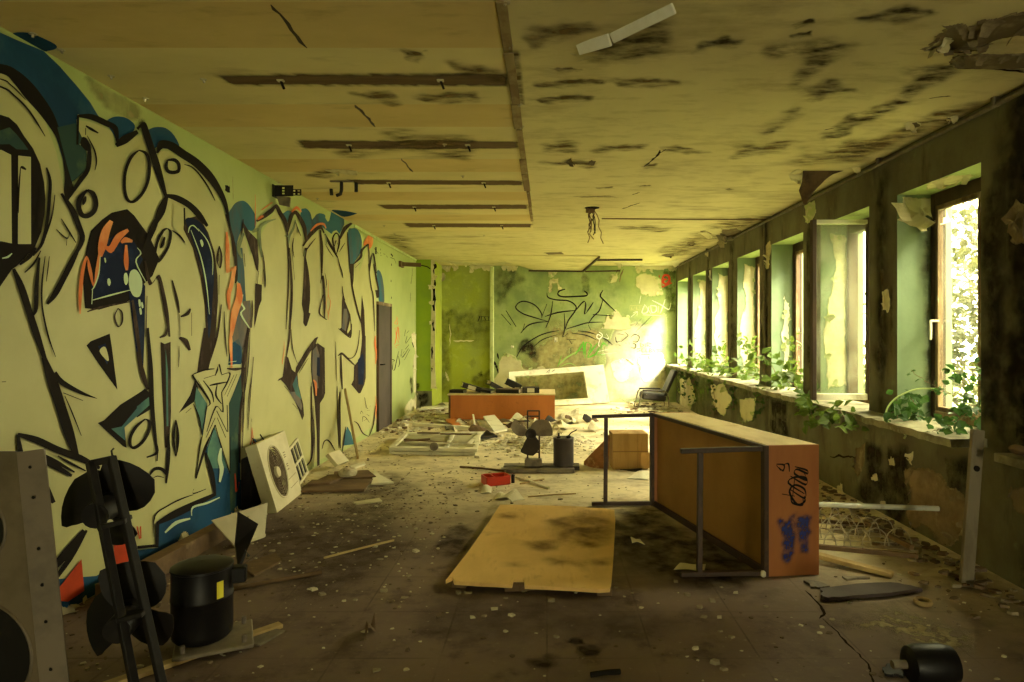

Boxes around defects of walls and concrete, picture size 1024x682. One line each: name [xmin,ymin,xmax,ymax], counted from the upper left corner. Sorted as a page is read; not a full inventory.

peeling [919,12,1024,70]
damp [221,64,523,105]
damp [299,133,519,157]
damp [799,66,967,163]
peeling [892,174,976,231]
damp [516,327,601,400]
spalling [608,253,684,297]
peeling [781,296,792,372]
peeling [823,233,847,389]
peeling [710,383,756,423]
damp [859,444,907,522]
crack [806,591,874,682]